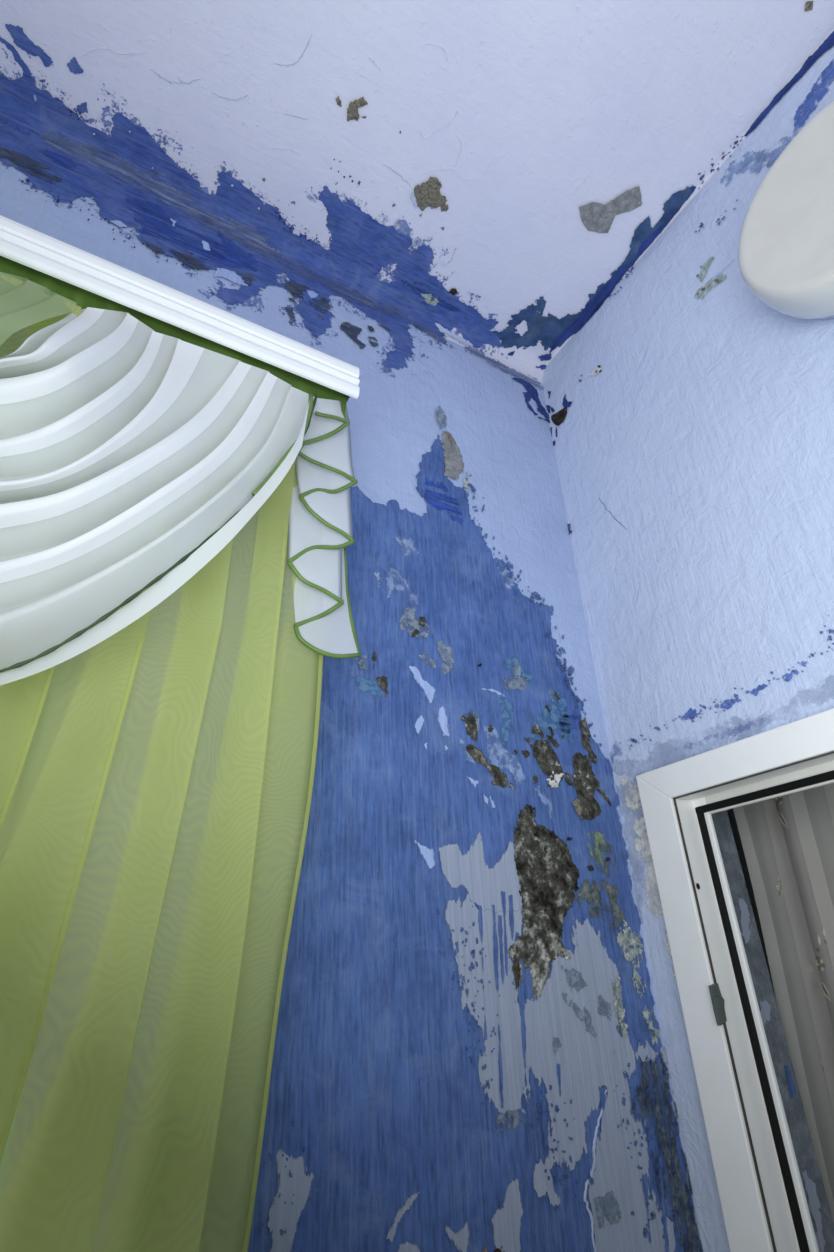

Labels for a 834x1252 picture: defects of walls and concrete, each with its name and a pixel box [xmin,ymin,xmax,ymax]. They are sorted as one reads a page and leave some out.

peeling [0,24,834,446]
peeling [248,406,834,1252]
damp [616,716,770,818]
damp [567,830,703,1252]